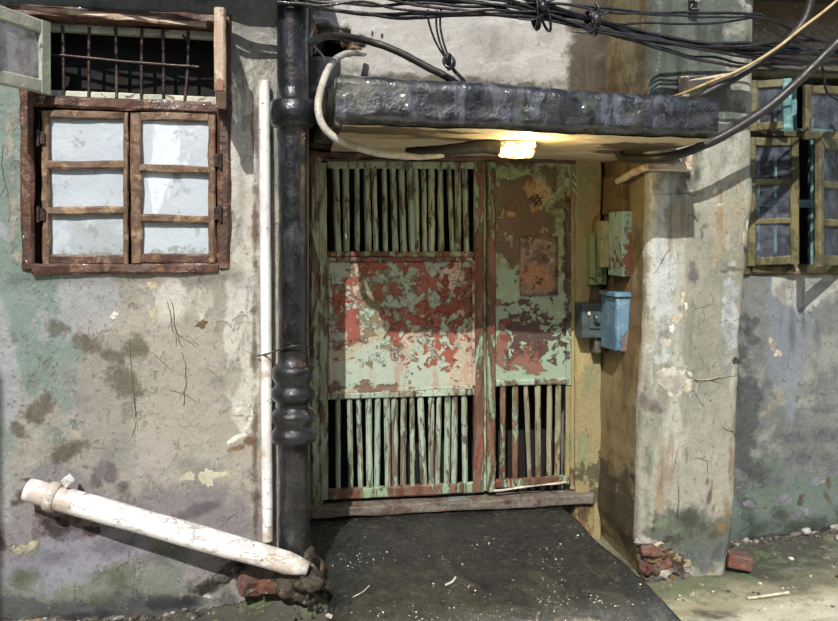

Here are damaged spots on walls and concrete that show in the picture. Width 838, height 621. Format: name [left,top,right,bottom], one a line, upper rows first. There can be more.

crack [167,301,199,348]
water stain [102,335,148,397]
crack [130,341,138,436]
peeling [657,365,692,396]
crack [691,375,738,406]
water stain [12,395,52,436]
water stain [54,441,86,460]
water stain [92,463,127,489]
water stain [177,502,216,519]
water stain [777,510,821,531]
water stain [13,541,37,554]